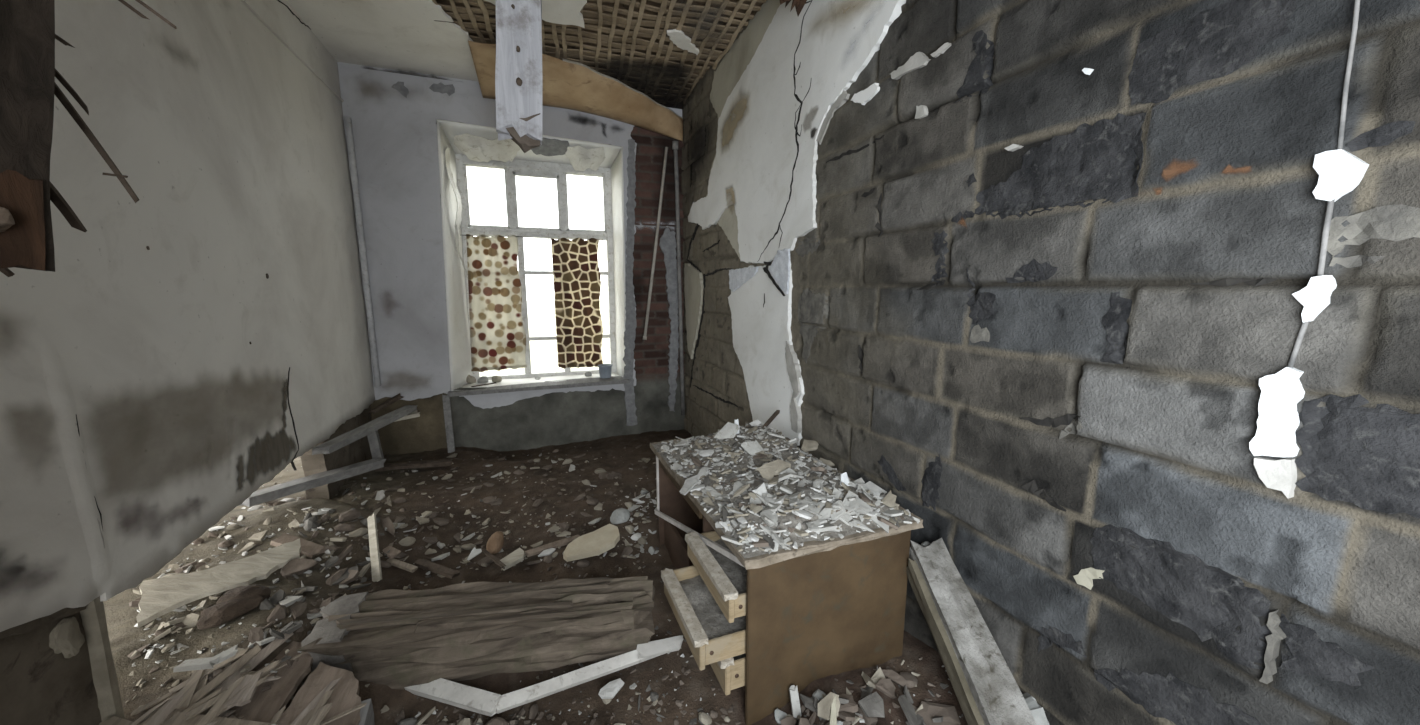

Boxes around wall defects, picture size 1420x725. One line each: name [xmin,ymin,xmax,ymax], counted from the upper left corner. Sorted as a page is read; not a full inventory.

crack [687,0,812,407]
flaking render [688,0,906,445]
spalling [930,0,1297,283]
spalling [1327,204,1420,268]
spalling [1347,121,1416,152]
flaking render [659,228,704,412]
spalling [1100,292,1132,364]
leakage [216,378,296,490]
spalling [878,454,943,511]
spalling [1295,394,1420,519]
spalling [1073,524,1376,686]
spalling [1036,626,1262,725]